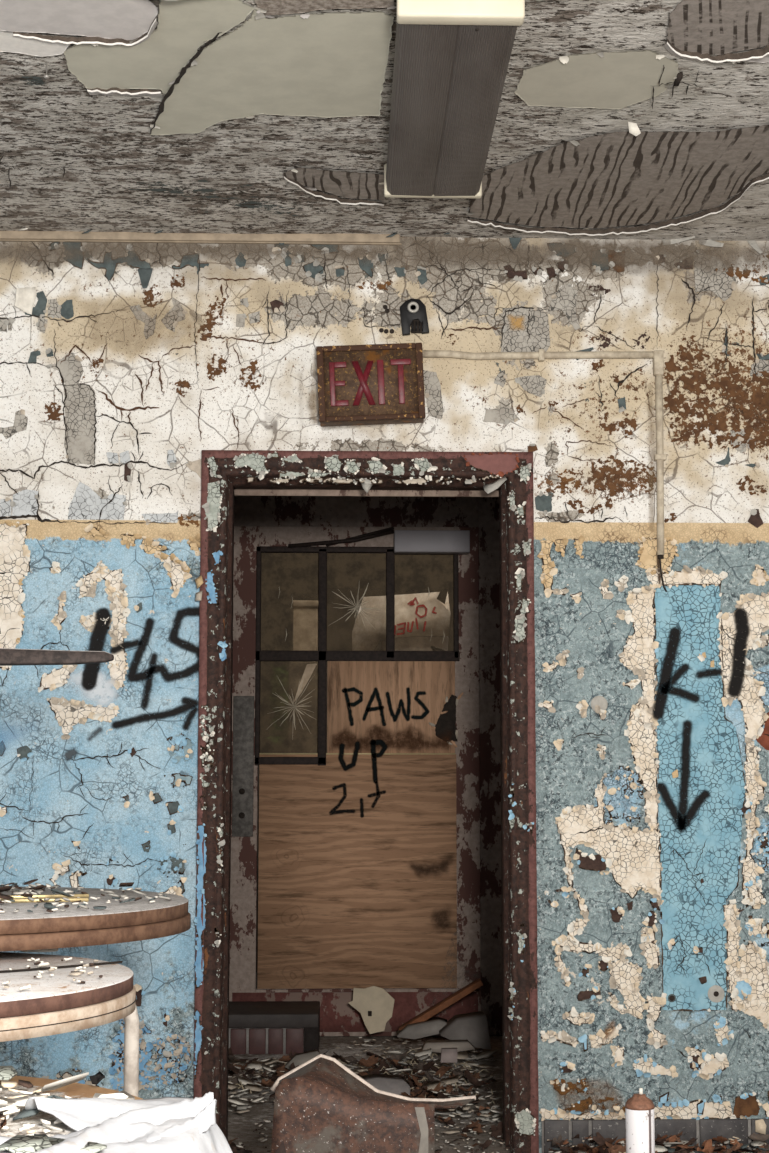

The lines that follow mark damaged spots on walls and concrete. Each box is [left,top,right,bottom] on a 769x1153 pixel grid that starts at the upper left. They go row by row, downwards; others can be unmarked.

crack [0,243,292,524]
peeling [84,456,223,606]
crack [385,236,549,348]
rust [591,331,625,386]
peeling [466,125,769,285]
rust [662,335,769,457]
rust [736,475,768,495]
peeling [38,560,142,740]
crack [654,584,745,818]
peeling [0,705,225,990]
peeling [538,535,769,1080]
crack [660,838,750,1037]